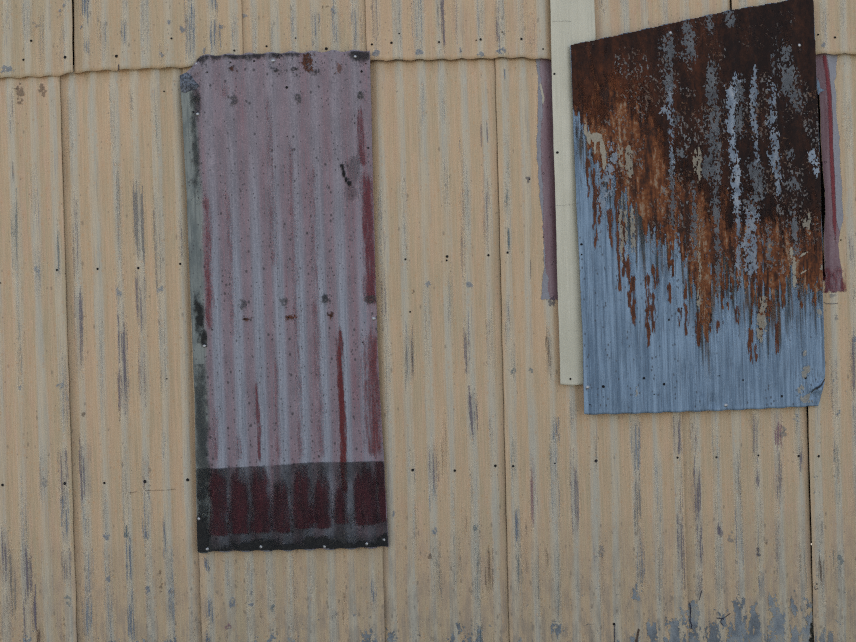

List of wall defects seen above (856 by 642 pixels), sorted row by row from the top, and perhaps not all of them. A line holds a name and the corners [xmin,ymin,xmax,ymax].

corrosion [571,0,823,364]
peeling [693,458,703,562]
peeling [20,545,40,642]
peeling [98,526,153,642]
peeling [630,590,841,642]